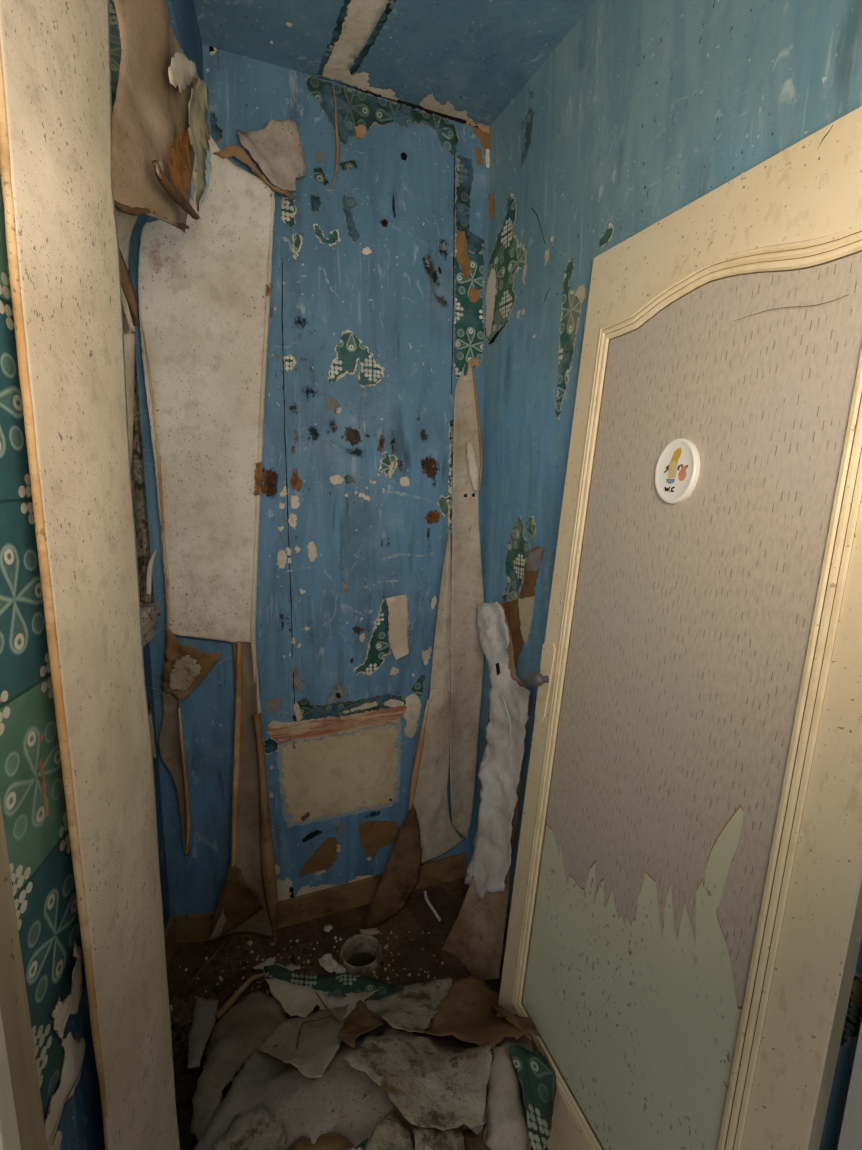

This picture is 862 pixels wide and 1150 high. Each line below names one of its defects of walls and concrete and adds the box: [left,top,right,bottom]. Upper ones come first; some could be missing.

peeling [281,195,372,256]
peeling [304,76,527,378]
peeling [327,329,385,388]
peeling [555,258,586,420]
peeling [278,484,300,531]
peeling [330,451,410,501]
peeling [437,419,454,546]
peeling [146,550,157,595]
peeling [277,541,318,569]
flaking render [263,599,432,861]
flaking render [275,837,373,901]
peeling [839,973,862,1050]